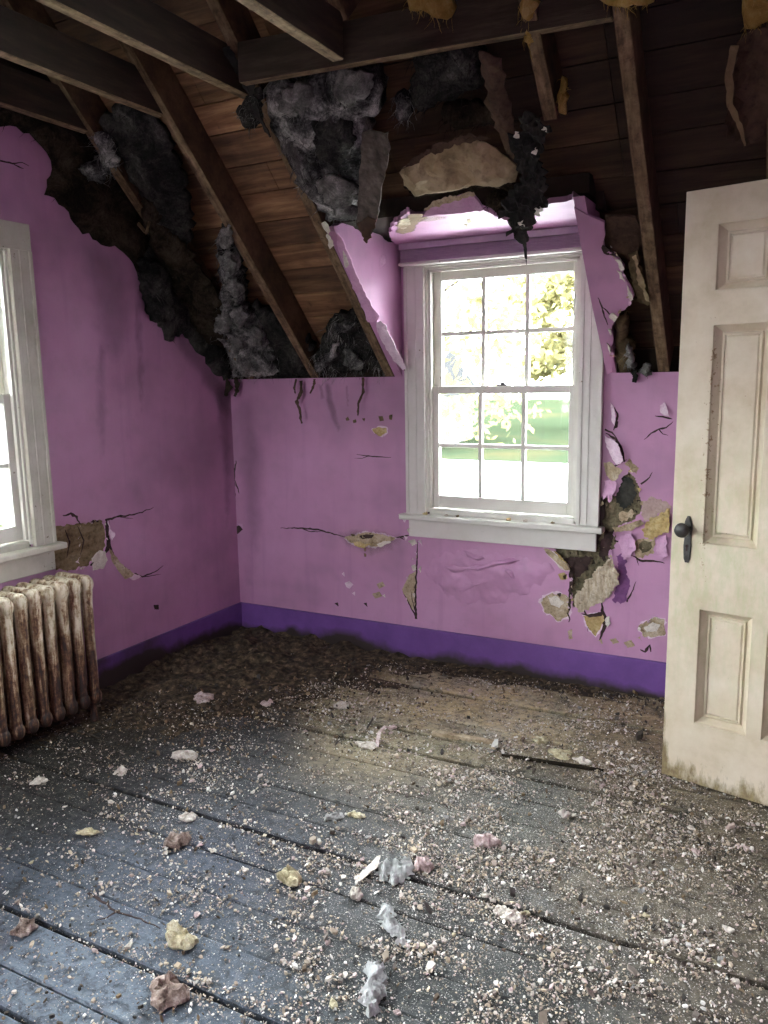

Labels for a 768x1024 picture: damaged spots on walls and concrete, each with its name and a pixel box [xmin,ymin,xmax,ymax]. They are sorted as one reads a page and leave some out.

peeling [321,221,406,371]
peeling [346,414,393,437]
crack [644,422,673,440]
crack [105,508,152,521]
crack [285,527,344,537]
spalling [538,402,672,653]
spalling [54,520,134,579]
crack [124,566,161,580]
crack [396,535,421,619]